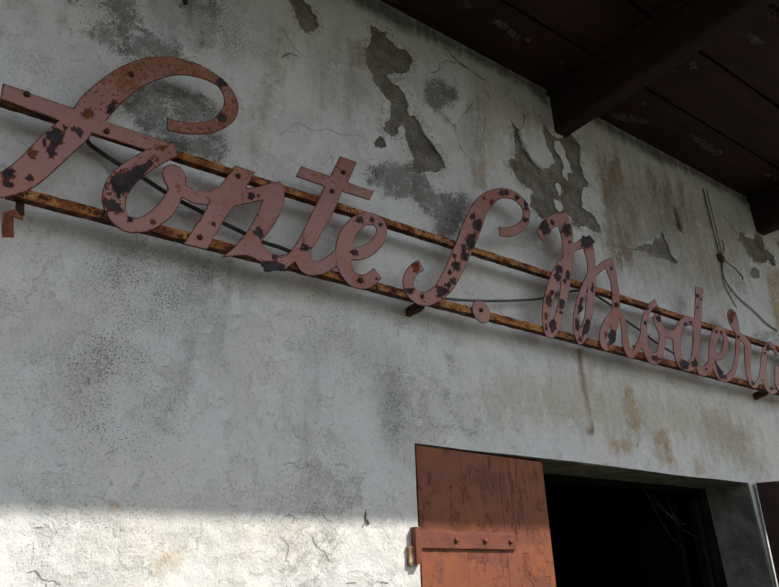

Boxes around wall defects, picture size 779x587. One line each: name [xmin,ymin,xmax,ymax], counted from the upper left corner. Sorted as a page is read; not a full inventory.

spalling [288,0,321,33]
spalling [361,24,472,239]
crack [429,47,490,157]
spalling [505,113,600,233]
spalling [634,232,676,264]
spalling [738,233,779,278]